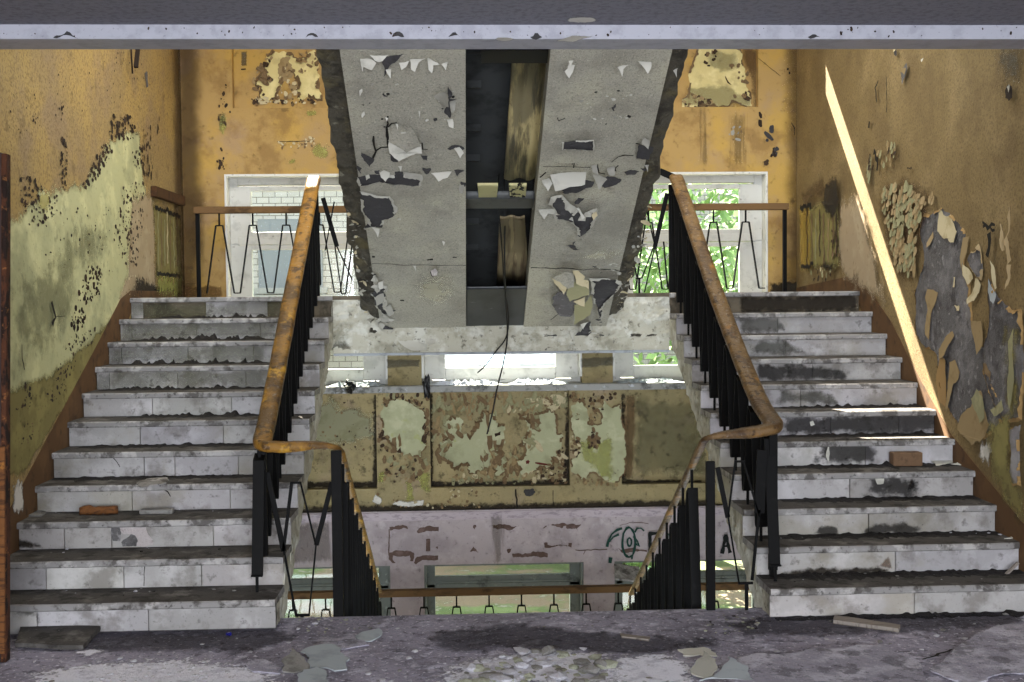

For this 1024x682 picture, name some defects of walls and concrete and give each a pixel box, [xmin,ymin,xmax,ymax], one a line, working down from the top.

spalling [251,27,466,351]
peeling [373,391,627,509]
spalling [539,49,779,350]
leakage [770,49,839,292]
peeling [866,141,896,184]
peeling [881,166,1024,513]